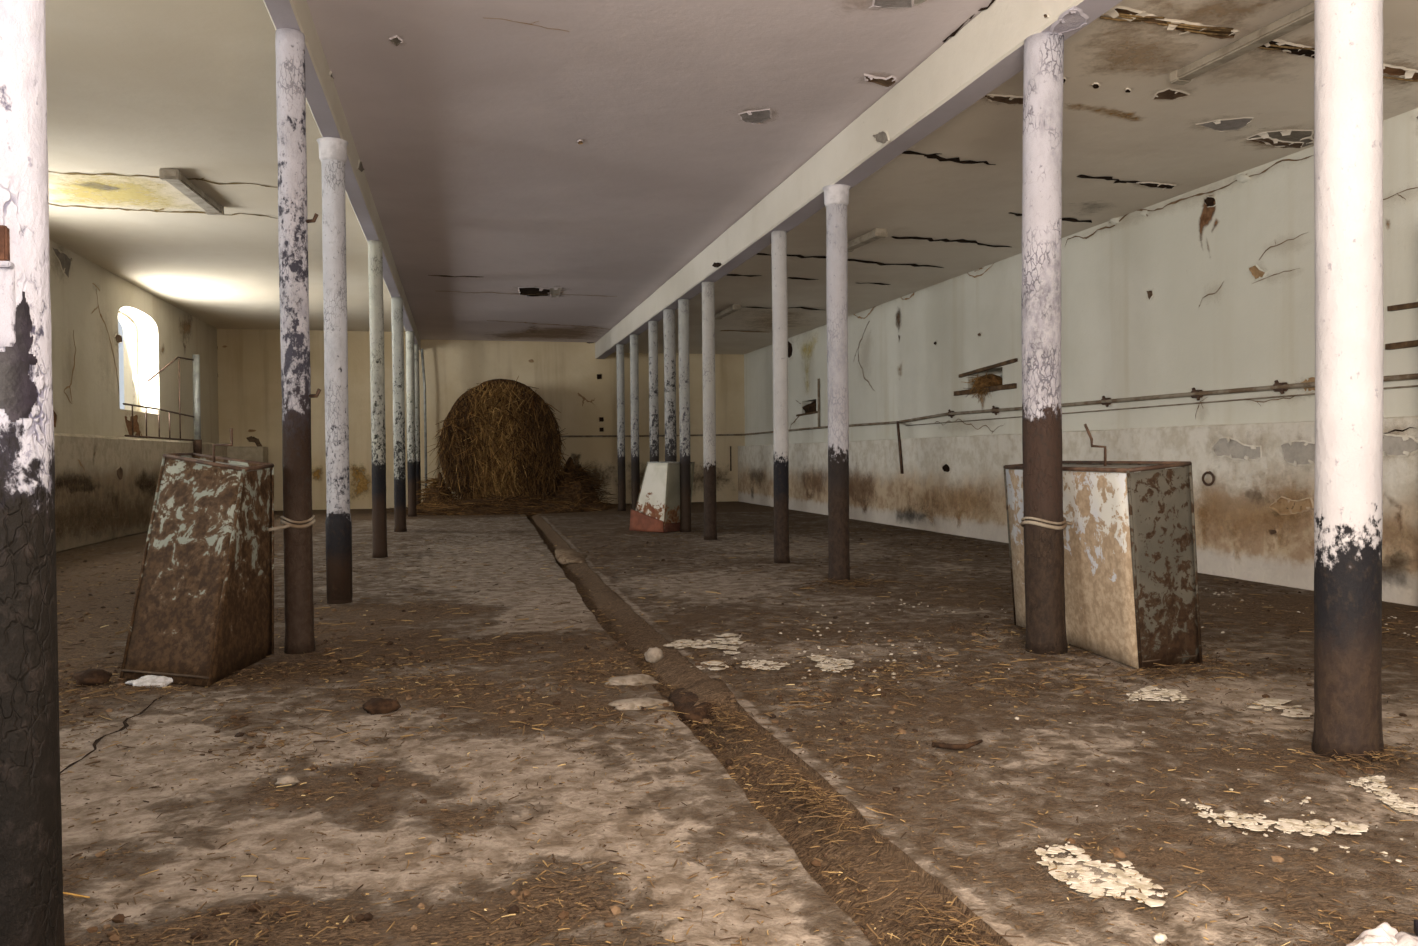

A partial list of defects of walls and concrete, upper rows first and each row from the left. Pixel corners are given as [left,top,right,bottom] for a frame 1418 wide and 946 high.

peeling [869,0,934,9]
crack [901,151,996,165]
peeling [1196,117,1314,148]
crack [1062,155,1313,245]
corrosion [1199,199,1218,239]
crack [721,212,1022,391]
peeling [0,291,38,422]
leakage [55,473,156,537]
crack [60,697,162,774]